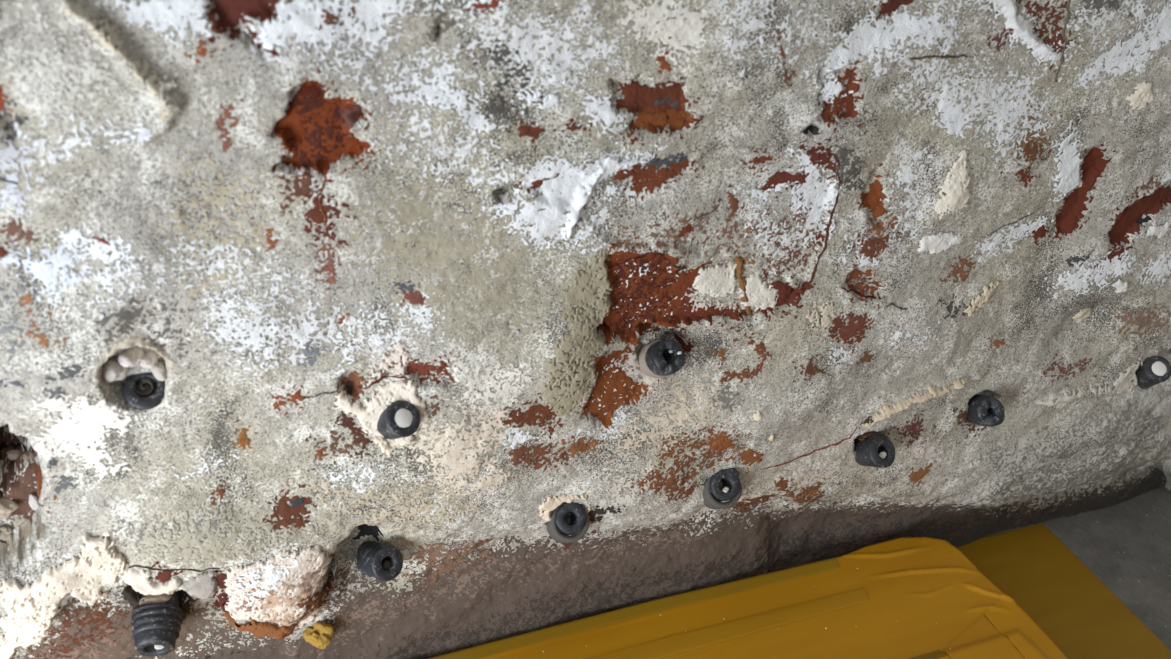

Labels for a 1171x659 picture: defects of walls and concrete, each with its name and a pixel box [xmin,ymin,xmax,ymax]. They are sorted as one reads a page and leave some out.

corrosion [281,89,360,169]
corrosion [620,96,701,143]
corrosion [1122,175,1163,203]
corrosion [303,185,357,291]
flaking render [499,158,900,477]
flaking render [210,476,233,513]
flaking render [257,477,317,535]
leakage [11,384,1171,659]
corrosion [621,423,764,496]
flaking render [0,531,342,659]